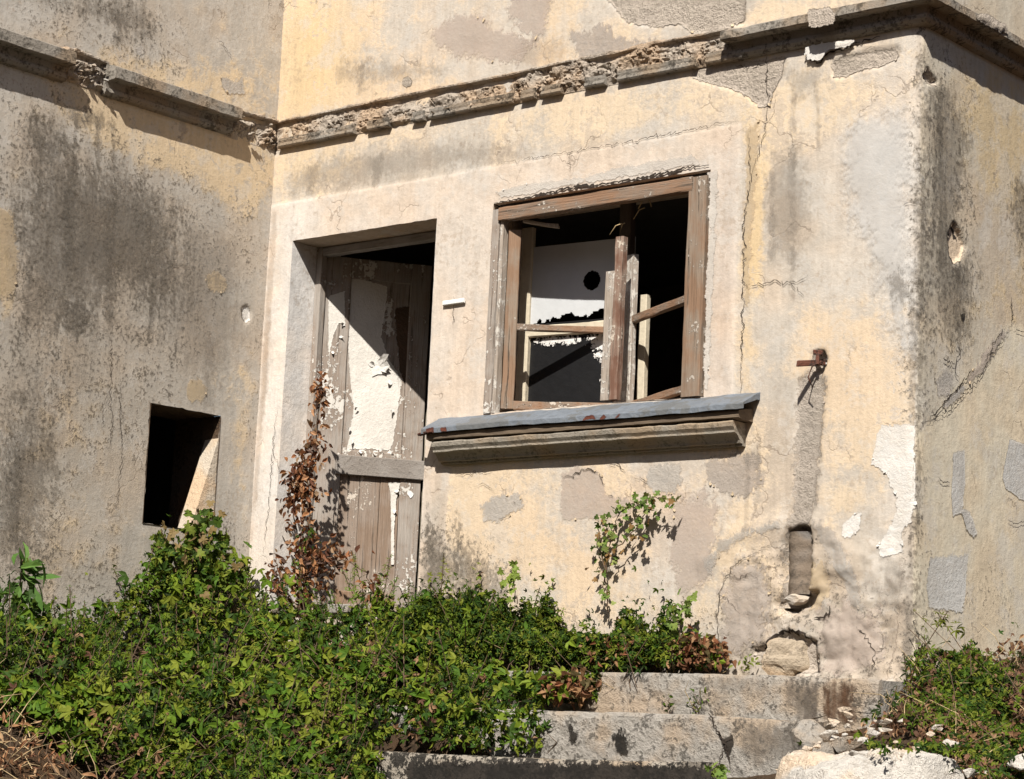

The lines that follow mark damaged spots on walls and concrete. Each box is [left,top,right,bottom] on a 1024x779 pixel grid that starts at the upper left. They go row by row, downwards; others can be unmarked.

spalling [804,39,900,78]
crack [496,57,808,392]
spalling [947,224,964,264]
spalling [241,307,250,323]
peeling [328,279,409,456]
crack [929,297,1023,422]
spalling [646,351,886,677]
peeling [870,423,917,558]